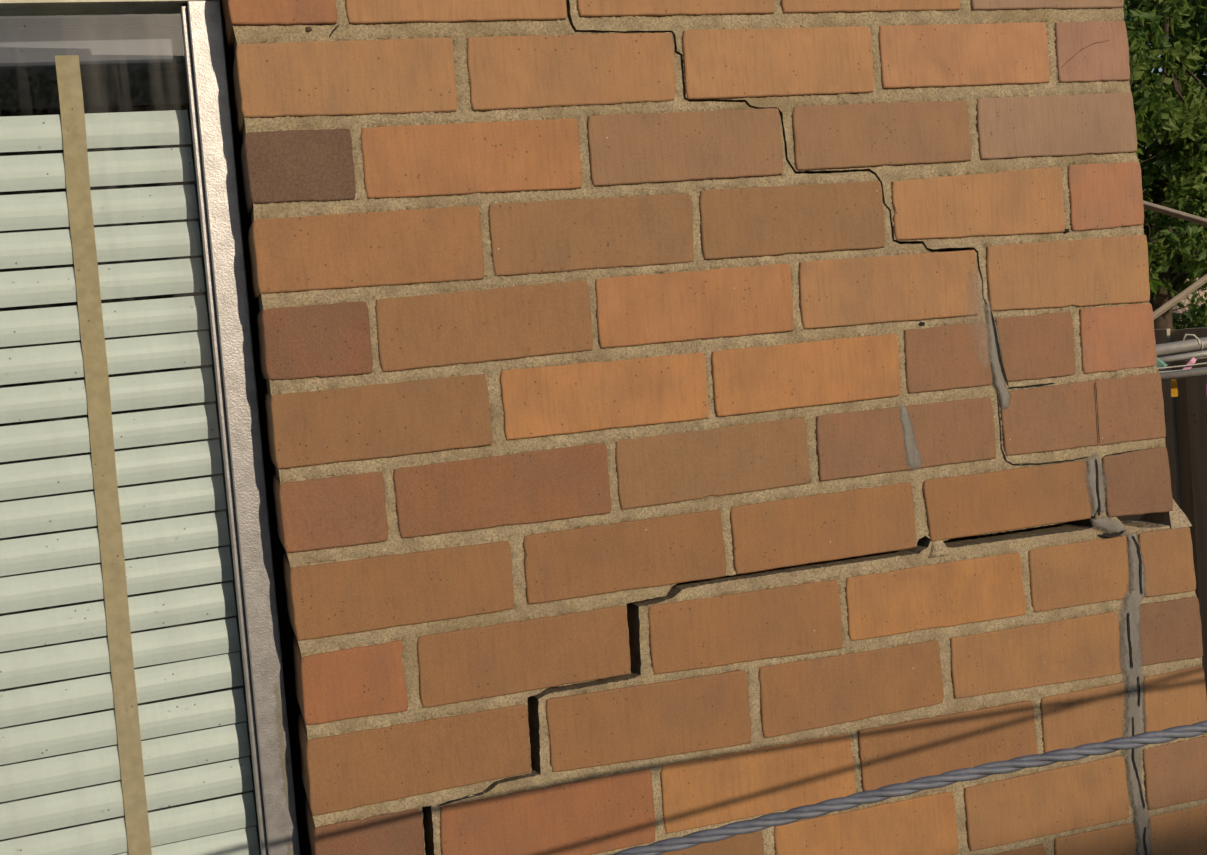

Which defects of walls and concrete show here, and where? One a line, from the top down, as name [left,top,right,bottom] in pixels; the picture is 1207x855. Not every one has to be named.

crack [422,0,1147,855]